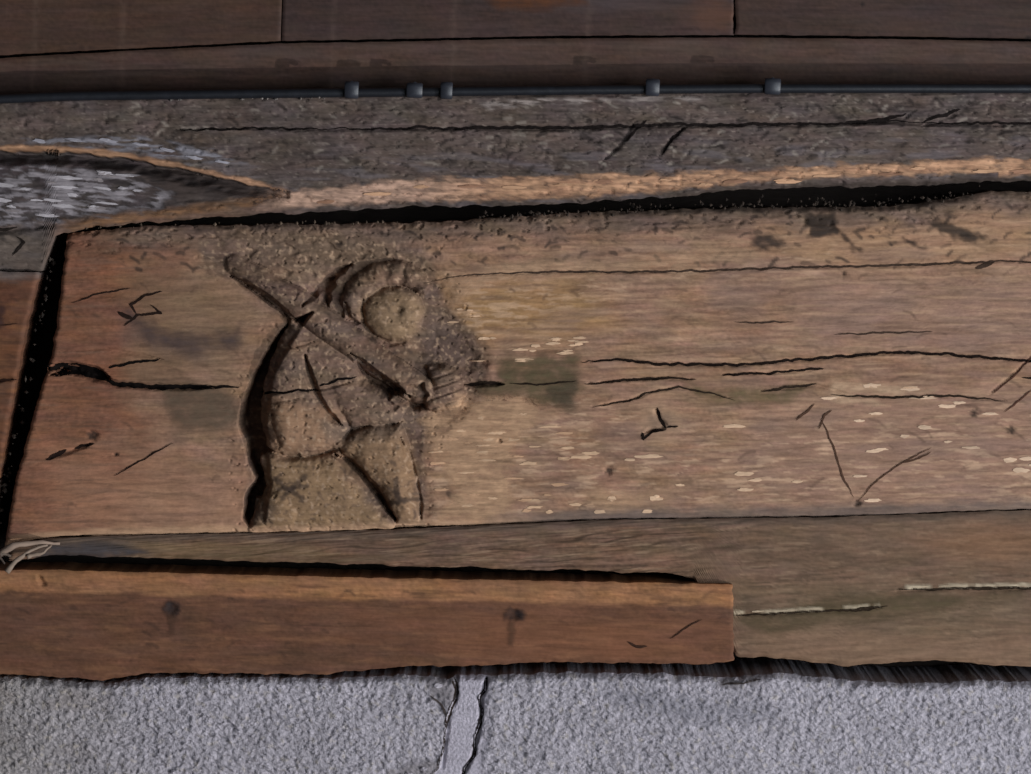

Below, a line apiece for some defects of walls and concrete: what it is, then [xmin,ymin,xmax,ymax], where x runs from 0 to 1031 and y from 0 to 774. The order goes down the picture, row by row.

crack [428,260,1031,283]
crack [737,318,787,326]
crack [47,358,357,395]
crack [466,331,1031,500]